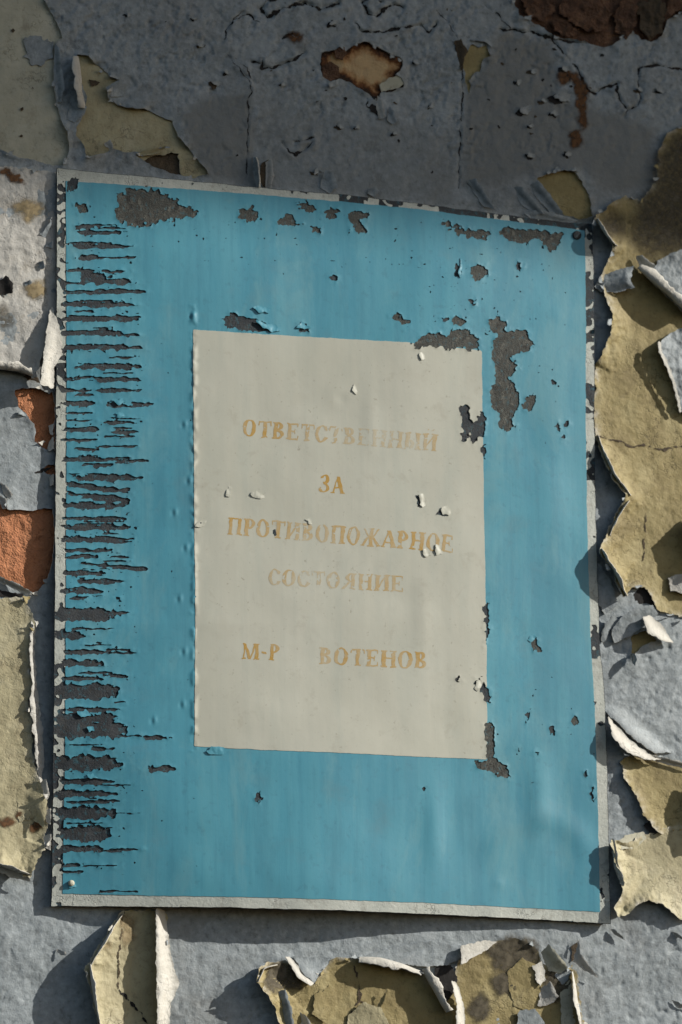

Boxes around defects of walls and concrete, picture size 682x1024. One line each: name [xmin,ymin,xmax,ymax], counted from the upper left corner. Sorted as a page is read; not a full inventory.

spalling [313,42,420,142]
peeling [513,69,592,135]
peeling [0,0,208,451]
peeling [514,126,682,666]
spalling [35,465,55,486]
peeling [0,482,54,882]
peeling [605,701,682,920]
peeling [84,909,180,1024]
peeling [256,940,598,1024]